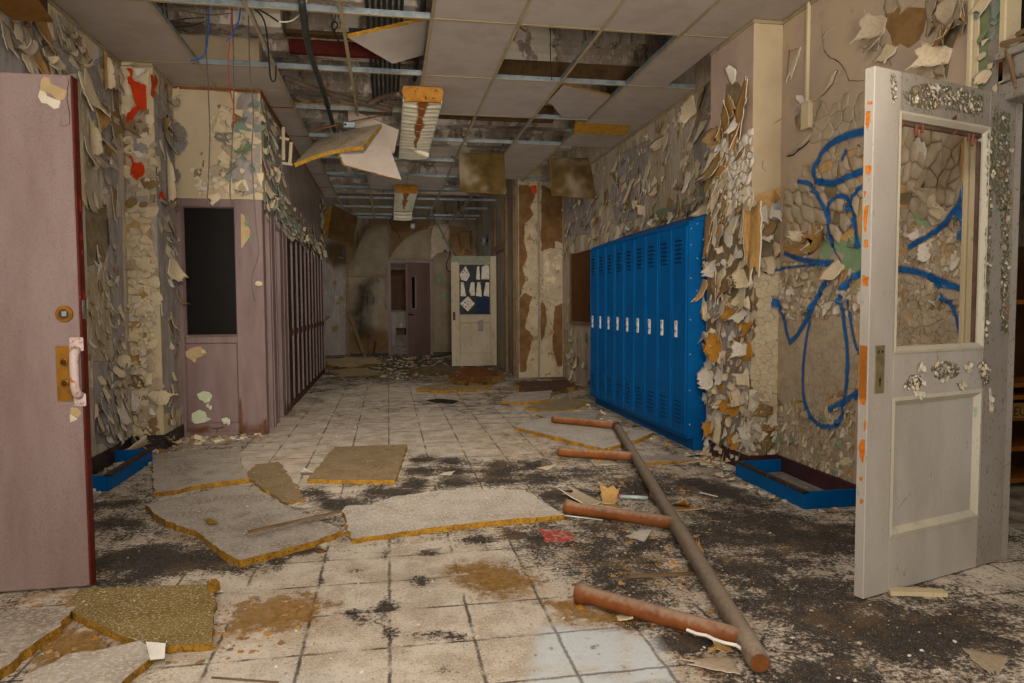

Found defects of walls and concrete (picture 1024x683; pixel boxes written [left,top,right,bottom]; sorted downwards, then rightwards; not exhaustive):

peeling [0,15,346,451]
peeling [540,64,869,477]
crack [712,25,865,482]
peeling [852,0,1014,344]